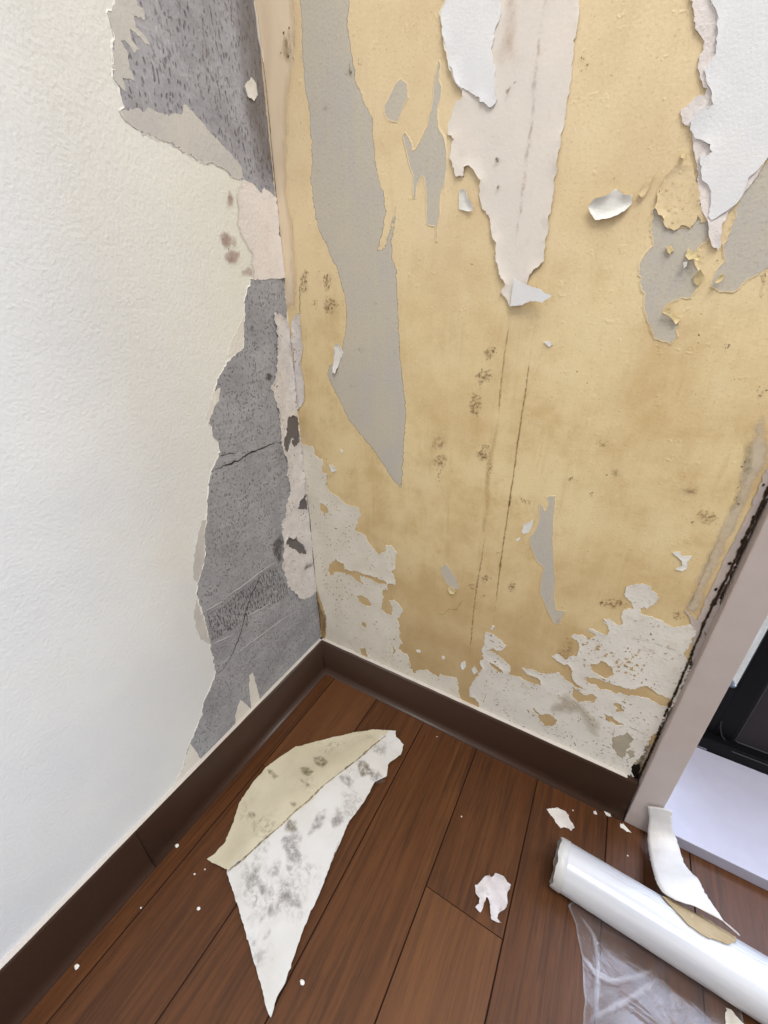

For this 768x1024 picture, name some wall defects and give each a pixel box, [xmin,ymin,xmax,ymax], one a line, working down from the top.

flaking render [105,0,275,196]
peeling [300,0,449,487]
peeling [459,189,473,212]
peeling [637,158,768,346]
flaking render [175,278,321,785]
crack [214,442,283,470]
peeling [516,495,566,625]
peeling [673,551,692,571]
leakage [635,483,768,782]